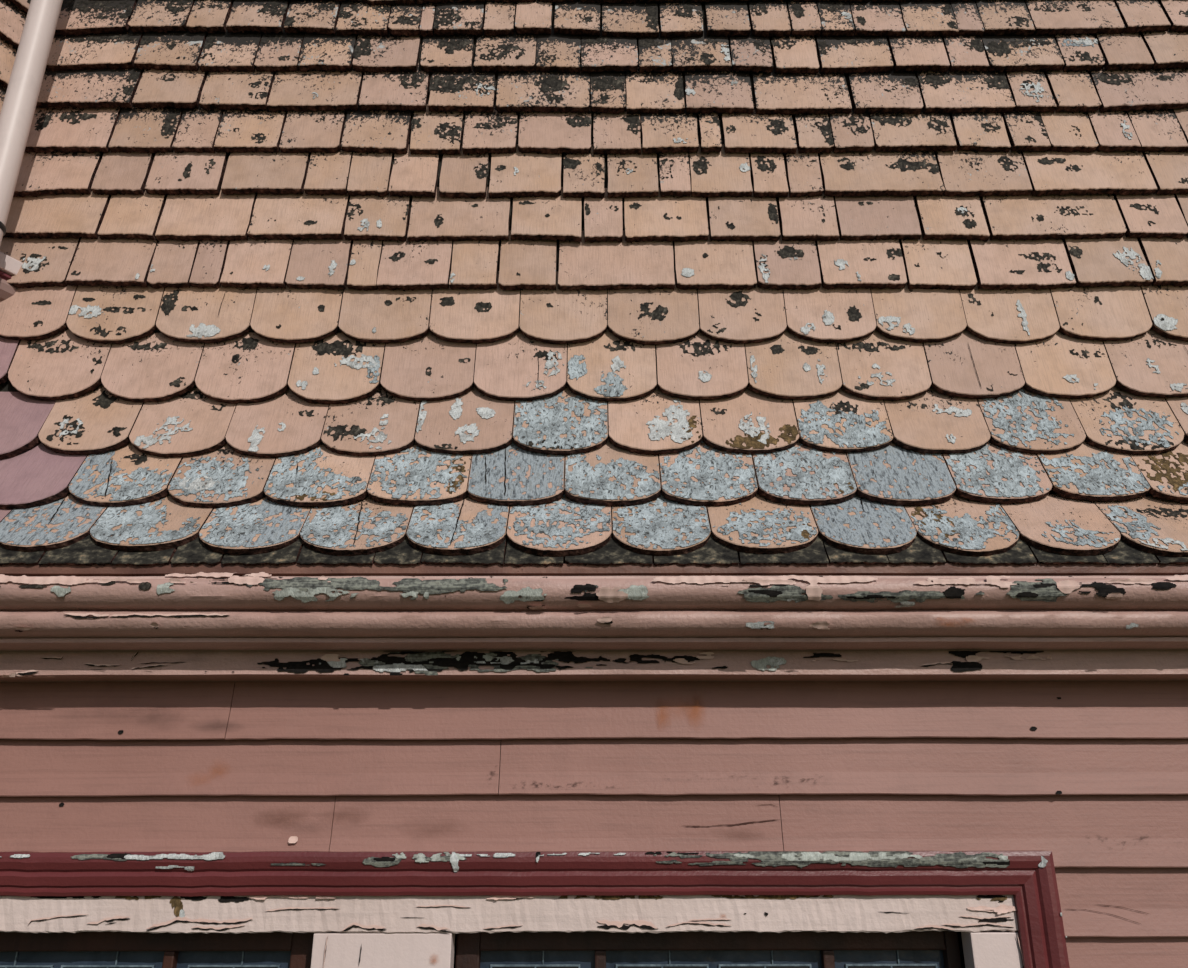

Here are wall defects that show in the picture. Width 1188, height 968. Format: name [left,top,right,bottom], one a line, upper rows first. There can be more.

peeling [257,0,420,60]
peeling [398,8,592,127]
peeling [981,74,1049,143]
peeling [411,116,517,144]
peeling [813,114,913,146]
peeling [885,158,939,174]
peeling [0,572,547,610]
peeling [564,575,1188,624]
peeling [257,651,728,675]
peeling [363,852,515,872]
peeling [645,851,1010,868]
peeling [115,896,336,918]